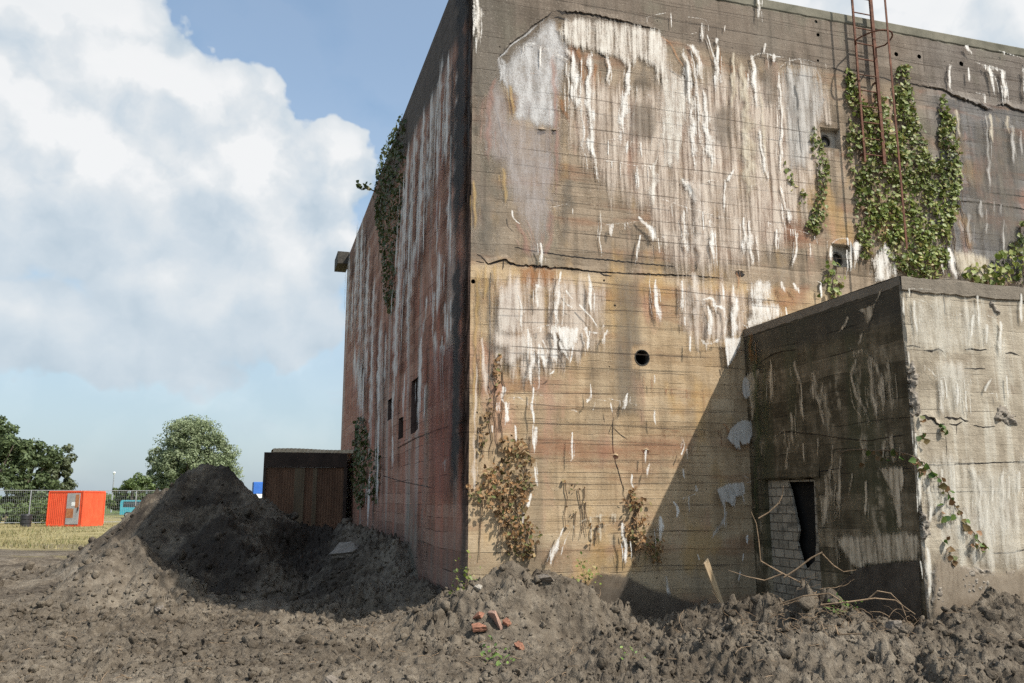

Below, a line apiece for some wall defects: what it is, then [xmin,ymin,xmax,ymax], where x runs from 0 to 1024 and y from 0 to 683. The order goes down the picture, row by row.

crack [831,67,1024,113]
leakage [344,0,608,549]
crack [477,247,723,395]
leakage [494,13,831,536]
leakage [903,288,1002,352]
leakage [924,363,971,412]
leakage [550,514,632,564]
leakage [821,446,853,524]
leakage [835,436,931,593]
leakage [912,433,1023,565]